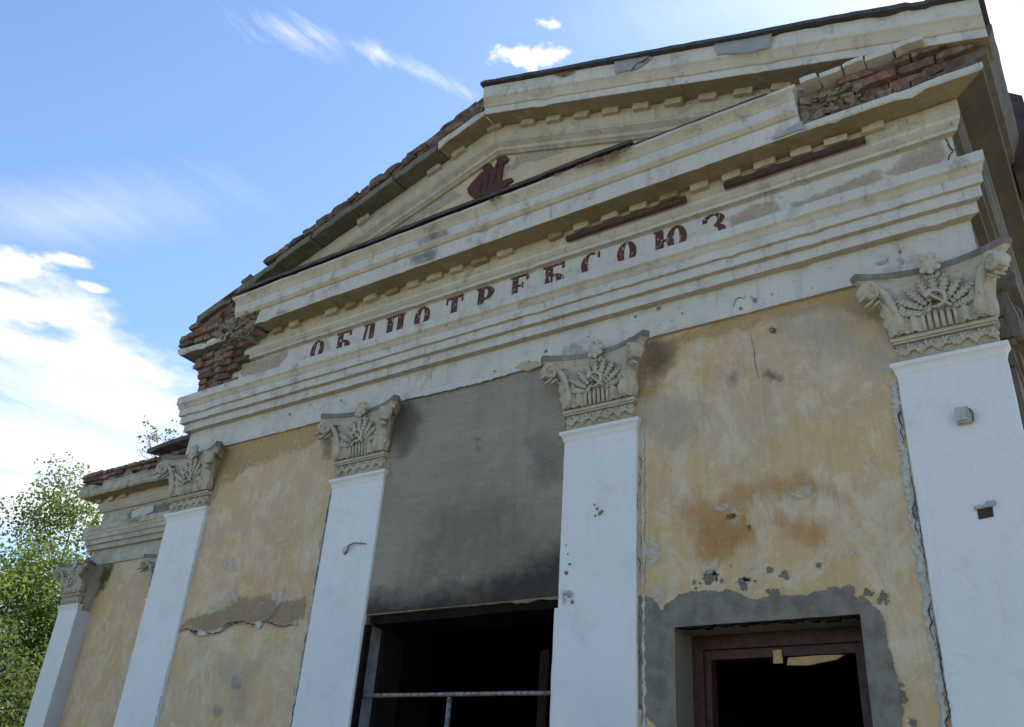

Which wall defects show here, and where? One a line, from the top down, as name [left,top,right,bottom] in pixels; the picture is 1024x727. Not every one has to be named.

spalling [772,36,977,139]
spalling [263,98,485,266]
spalling [178,274,287,392]
peeling [182,589,306,631]
crack [180,492,331,727]
spalling [679,614,860,631]
crack [889,380,951,727]